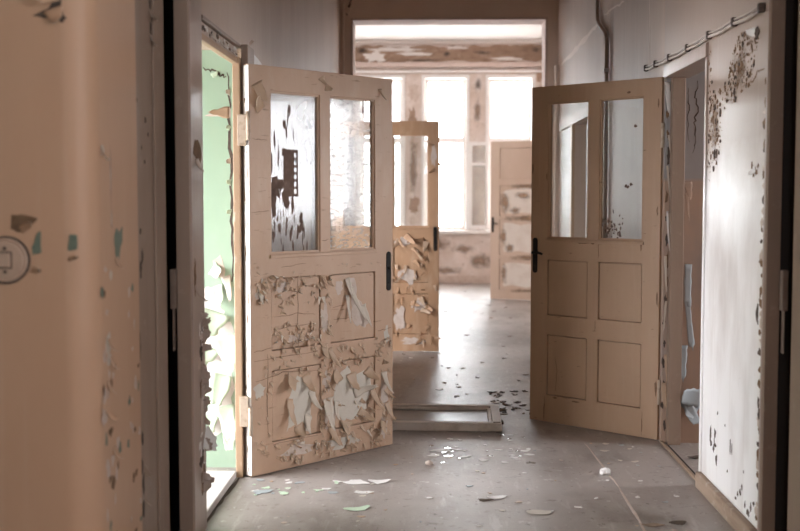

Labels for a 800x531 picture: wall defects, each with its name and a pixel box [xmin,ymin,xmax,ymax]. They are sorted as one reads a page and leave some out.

peeling [33,0,67,23]
peeling [355,44,542,87]
crack [687,81,699,152]
peeling [10,214,42,255]
peeling [67,234,79,261]
peeling [104,227,123,281]
peeling [748,162,764,356]
peeling [681,264,700,425]
peeling [194,255,236,496]
peeling [102,331,144,504]
peeling [735,484,758,521]